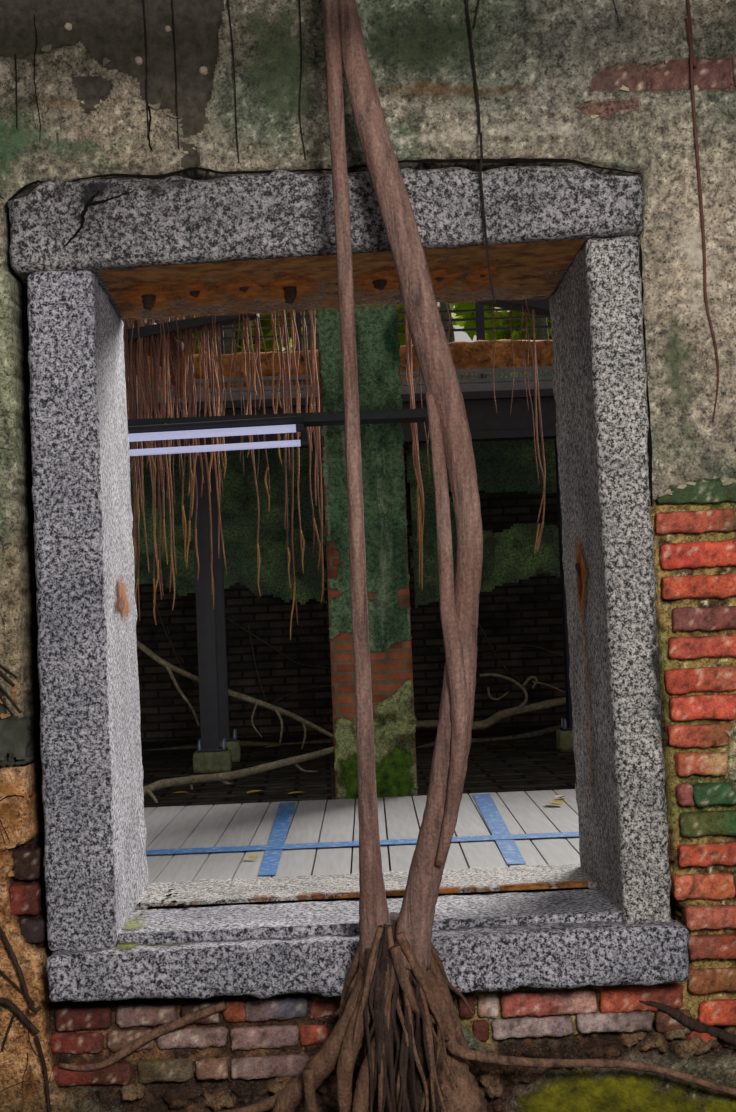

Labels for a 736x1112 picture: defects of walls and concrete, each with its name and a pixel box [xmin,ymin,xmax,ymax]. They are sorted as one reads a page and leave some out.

flaking render [584,54,736,118]
crack [0,103,367,248]
crack [398,158,641,175]
peeling [472,438,557,494]
rust [116,579,129,617]
rust [575,540,587,639]
flaking render [458,477,736,1042]
flaking render [4,844,47,943]